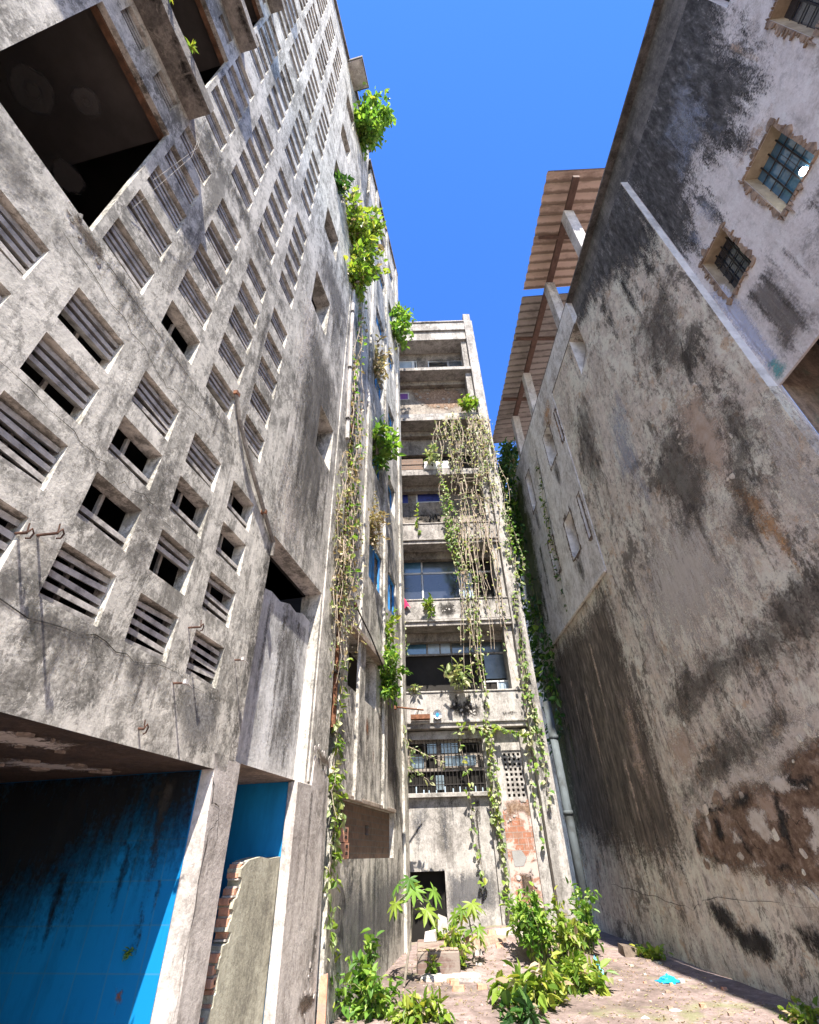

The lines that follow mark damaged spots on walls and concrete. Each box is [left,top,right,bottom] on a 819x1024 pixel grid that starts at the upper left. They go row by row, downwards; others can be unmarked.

water stain [576,0,768,378]
water stain [553,396,819,901]
peeling [0,731,113,774]
water stain [0,771,200,931]
spalling [503,798,531,823]
spalling [516,868,537,898]
crack [611,884,816,912]
spalling [681,705,819,908]